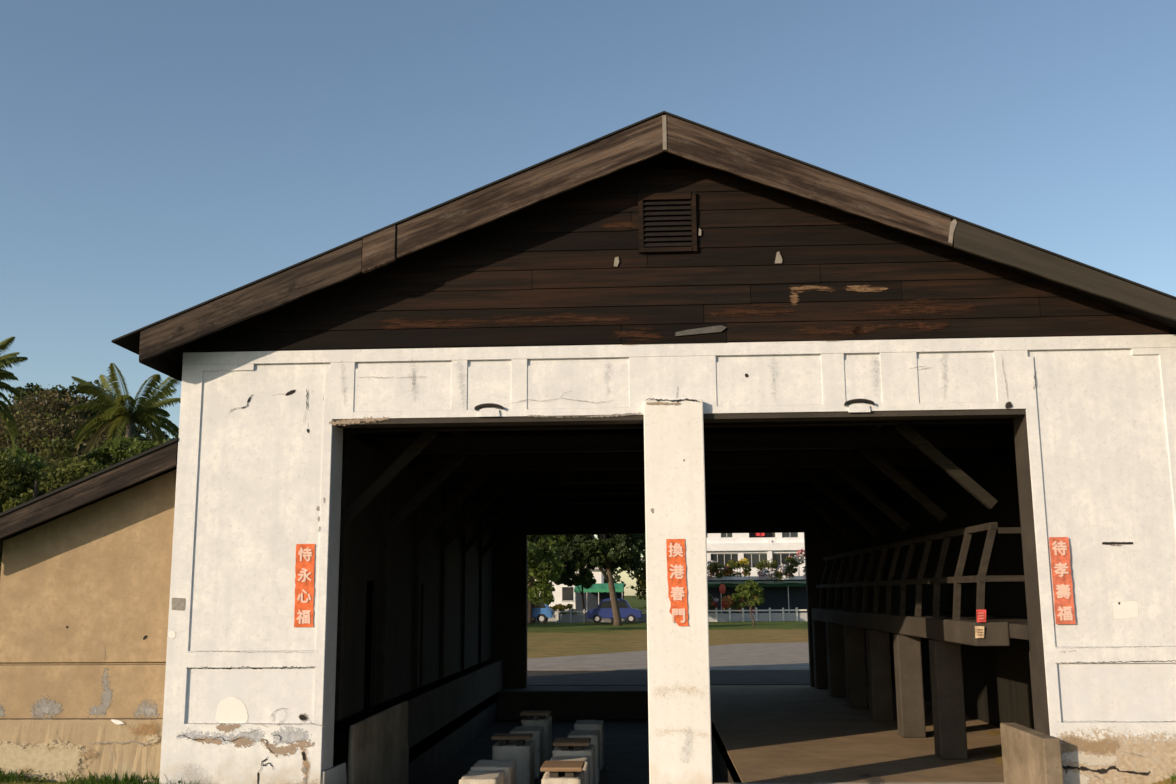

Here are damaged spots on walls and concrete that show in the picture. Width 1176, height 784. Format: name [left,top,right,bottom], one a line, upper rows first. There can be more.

flaking render [88,668,160,725]
flaking render [177,713,324,757]
flaking render [1058,730,1176,784]